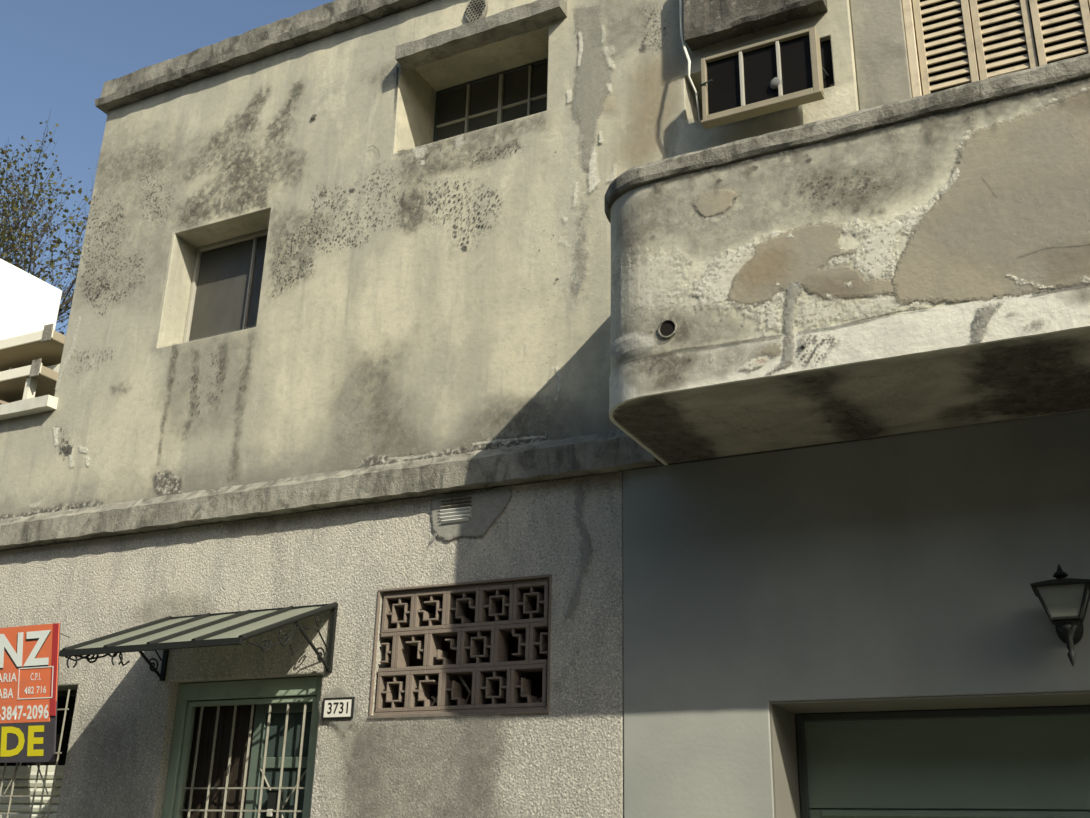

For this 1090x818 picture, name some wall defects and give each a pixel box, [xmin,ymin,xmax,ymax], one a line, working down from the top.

damp [184,86,304,222]
damp [82,198,143,297]
damp [273,225,325,296]
peeling [553,131,616,298]
peeling [612,86,1090,389]
damp [159,346,200,451]
flaking render [361,433,550,466]
damp [786,374,882,440]
damp [969,340,1090,417]
flaking render [0,500,102,520]